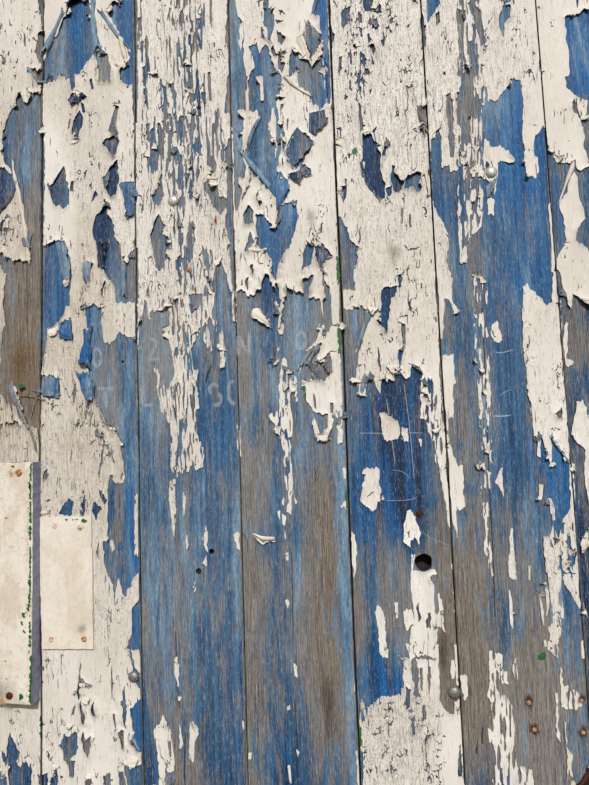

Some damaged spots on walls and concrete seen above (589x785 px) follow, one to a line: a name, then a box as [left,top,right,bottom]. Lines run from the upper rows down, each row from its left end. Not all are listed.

peeling [0,663,95,785]
peeling [0,0,150,454]
peeling [76,0,459,785]
peeling [431,0,589,785]